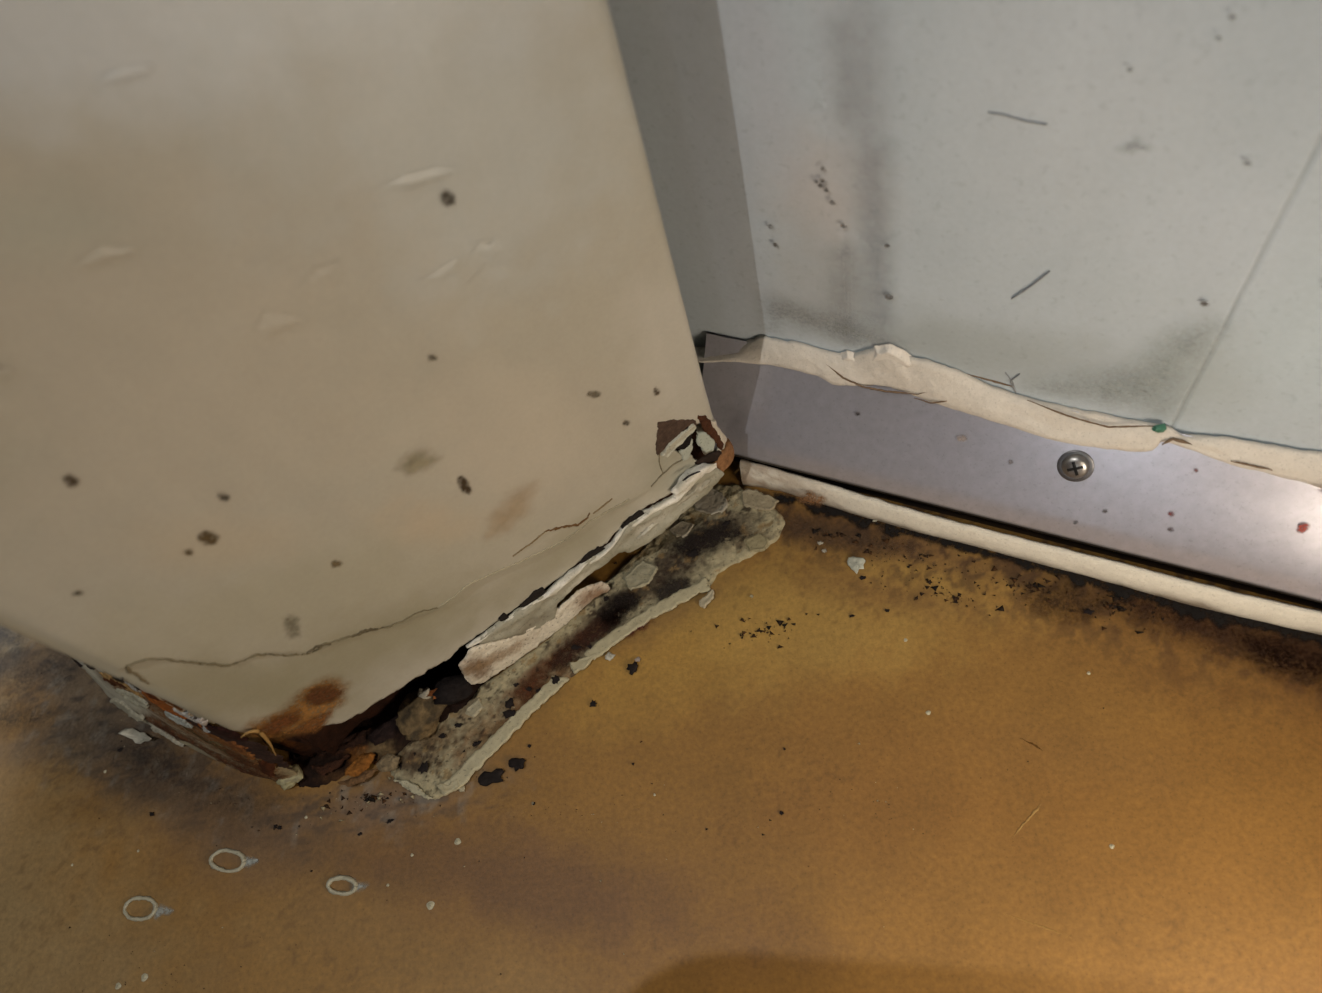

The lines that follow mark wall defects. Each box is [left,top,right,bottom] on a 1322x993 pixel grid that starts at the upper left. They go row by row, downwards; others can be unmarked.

peeling [97,669,211,747]
rust [114,605,520,780]
crack [111,454,682,685]
peeling [391,420,785,800]